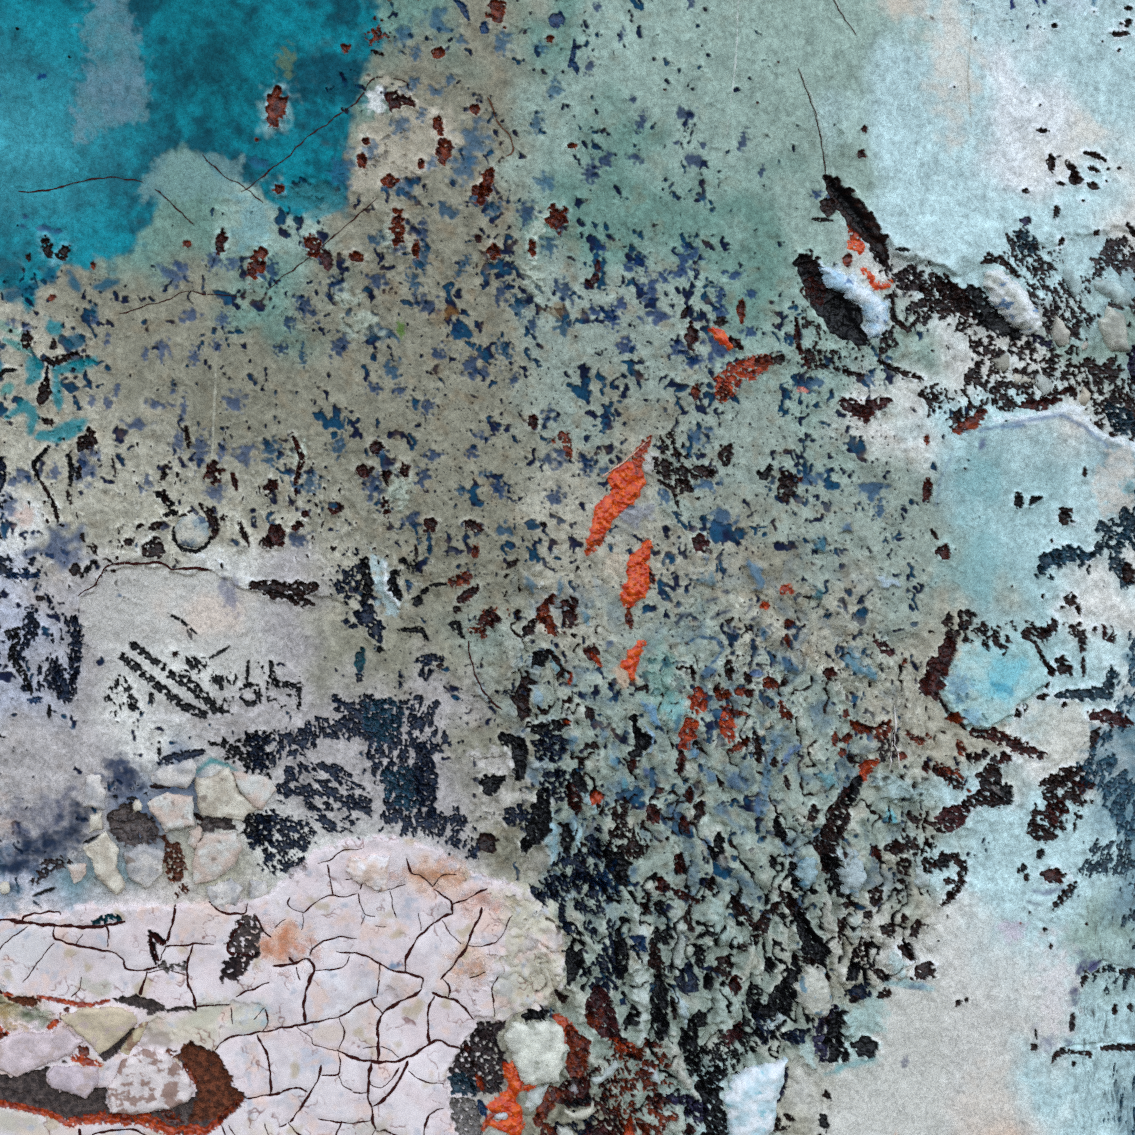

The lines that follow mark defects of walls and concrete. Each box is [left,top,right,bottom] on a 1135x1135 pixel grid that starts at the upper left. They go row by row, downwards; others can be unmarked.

spalling [792,175,1135,441]
corrosion [708,328,773,402]
peeling [522,594,578,638]
corrosion [584,435,652,556]
corrosion [620,541,656,628]
peeling [653,432,734,507]
spalling [1014,492,1042,508]
peeling [1034,490,1135,589]
peeling [447,609,1135,1135]
crack [0,848,513,1135]
corrosion [481,1014,591,1135]
corrosion [605,1037,678,1135]